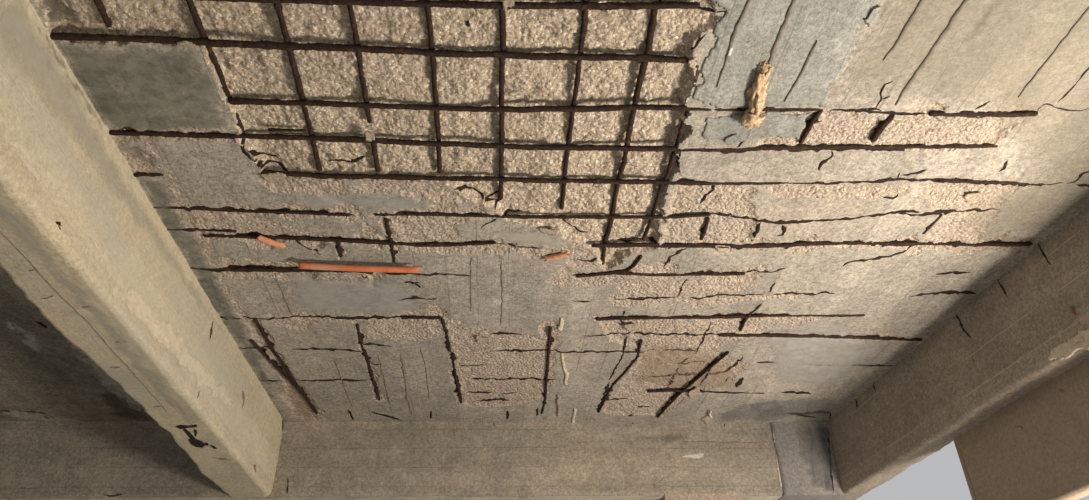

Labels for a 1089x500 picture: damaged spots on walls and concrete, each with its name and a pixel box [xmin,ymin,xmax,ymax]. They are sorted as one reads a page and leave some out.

spalling [34,0,1047,424]
crack [210,272,470,421]
crack [460,248,893,426]
crack [910,271,1008,338]
crack [781,391,834,492]